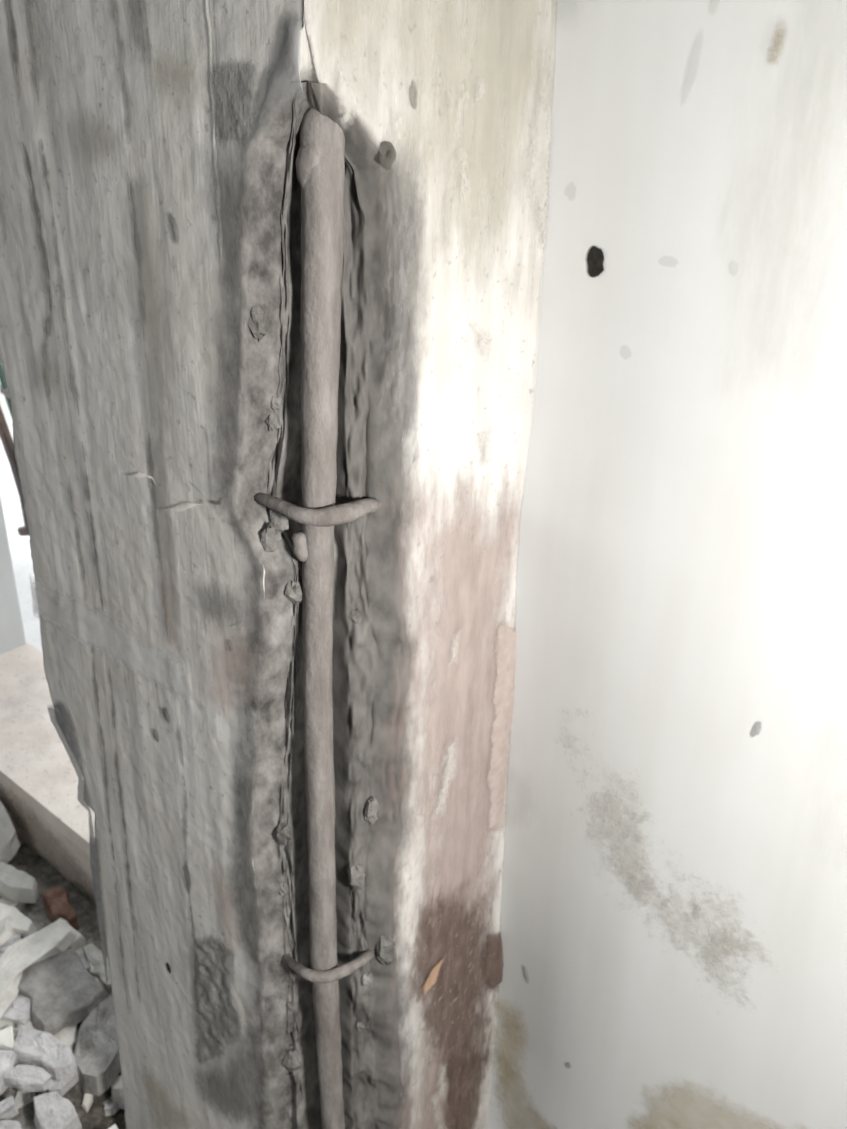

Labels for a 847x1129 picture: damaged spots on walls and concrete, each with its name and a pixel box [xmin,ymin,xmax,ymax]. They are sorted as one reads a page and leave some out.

spalling [193,64,418,1129]
flaking render [436,743,454,810]
rust [411,491,514,1129]
water stain [197,1028,253,1122]
water stain [499,1012,548,1129]
water stain [640,1089,766,1129]